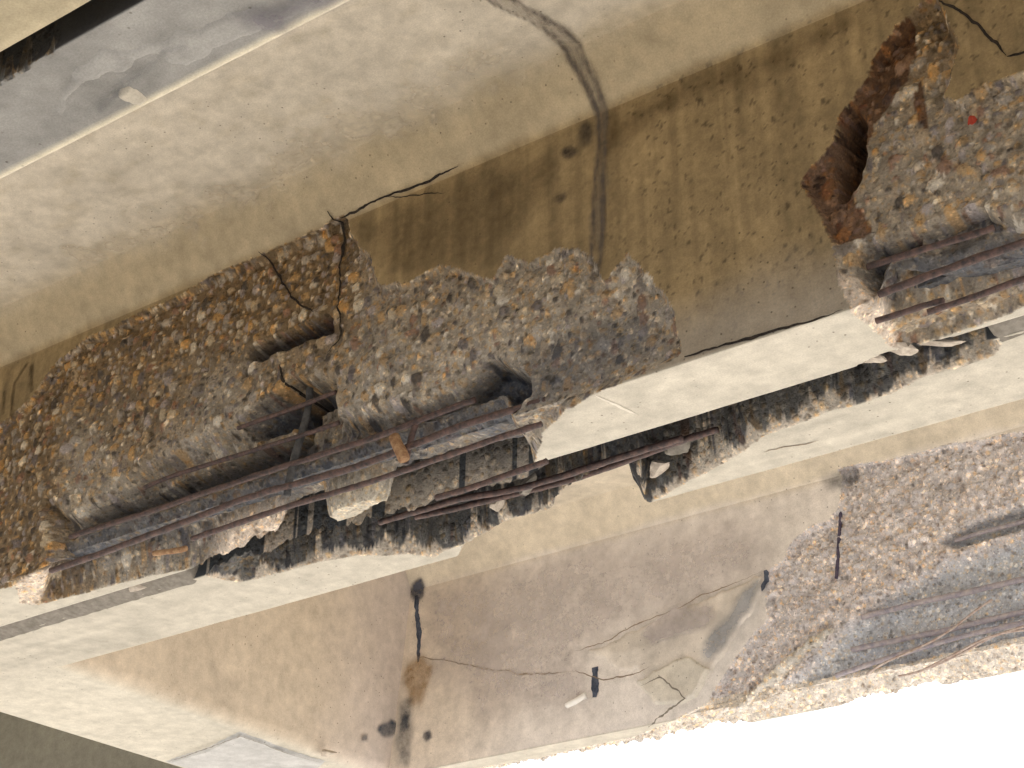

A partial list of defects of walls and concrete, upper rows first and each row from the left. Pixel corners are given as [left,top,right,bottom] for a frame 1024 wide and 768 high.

damp [524,12,603,141]
crack [939,0,1024,57]
crack [259,166,458,352]
spalling [0,0,1024,605]
crack [279,364,331,413]
spalling [482,430,1024,768]
damp [362,700,411,758]
crack [425,657,647,681]